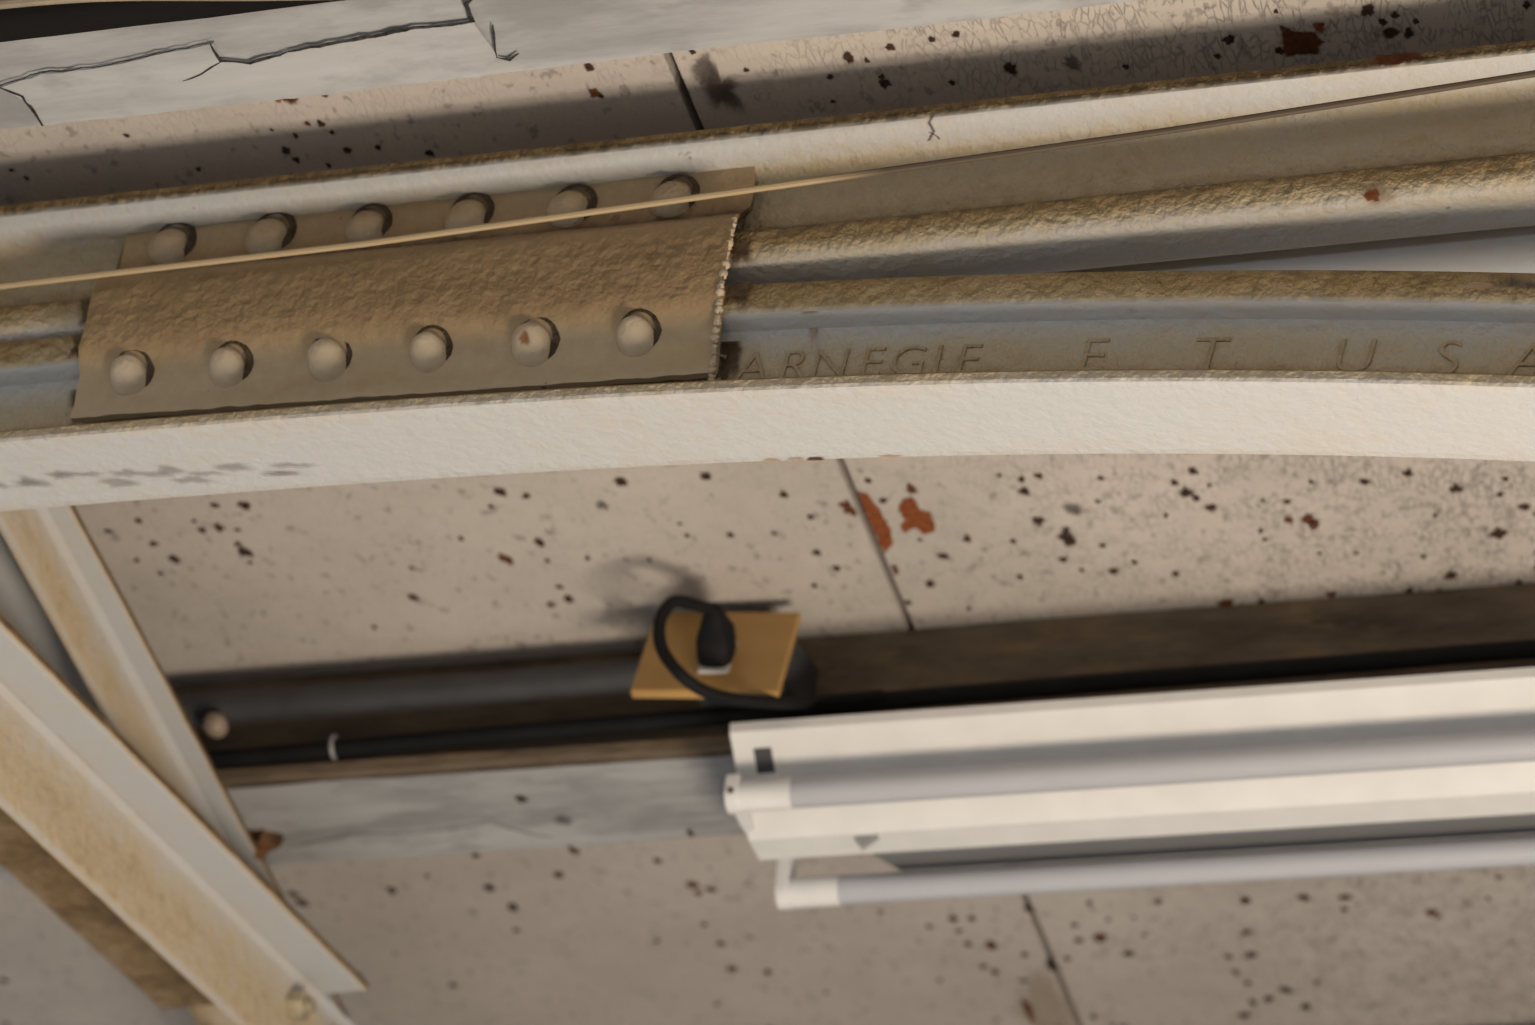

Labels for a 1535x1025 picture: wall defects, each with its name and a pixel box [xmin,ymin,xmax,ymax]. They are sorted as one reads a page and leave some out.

rust [1280,23,1325,57]
peeling [2,20,498,138]
peeling [585,63,604,98]
peeling [269,120,352,163]
rust [839,483,935,575]